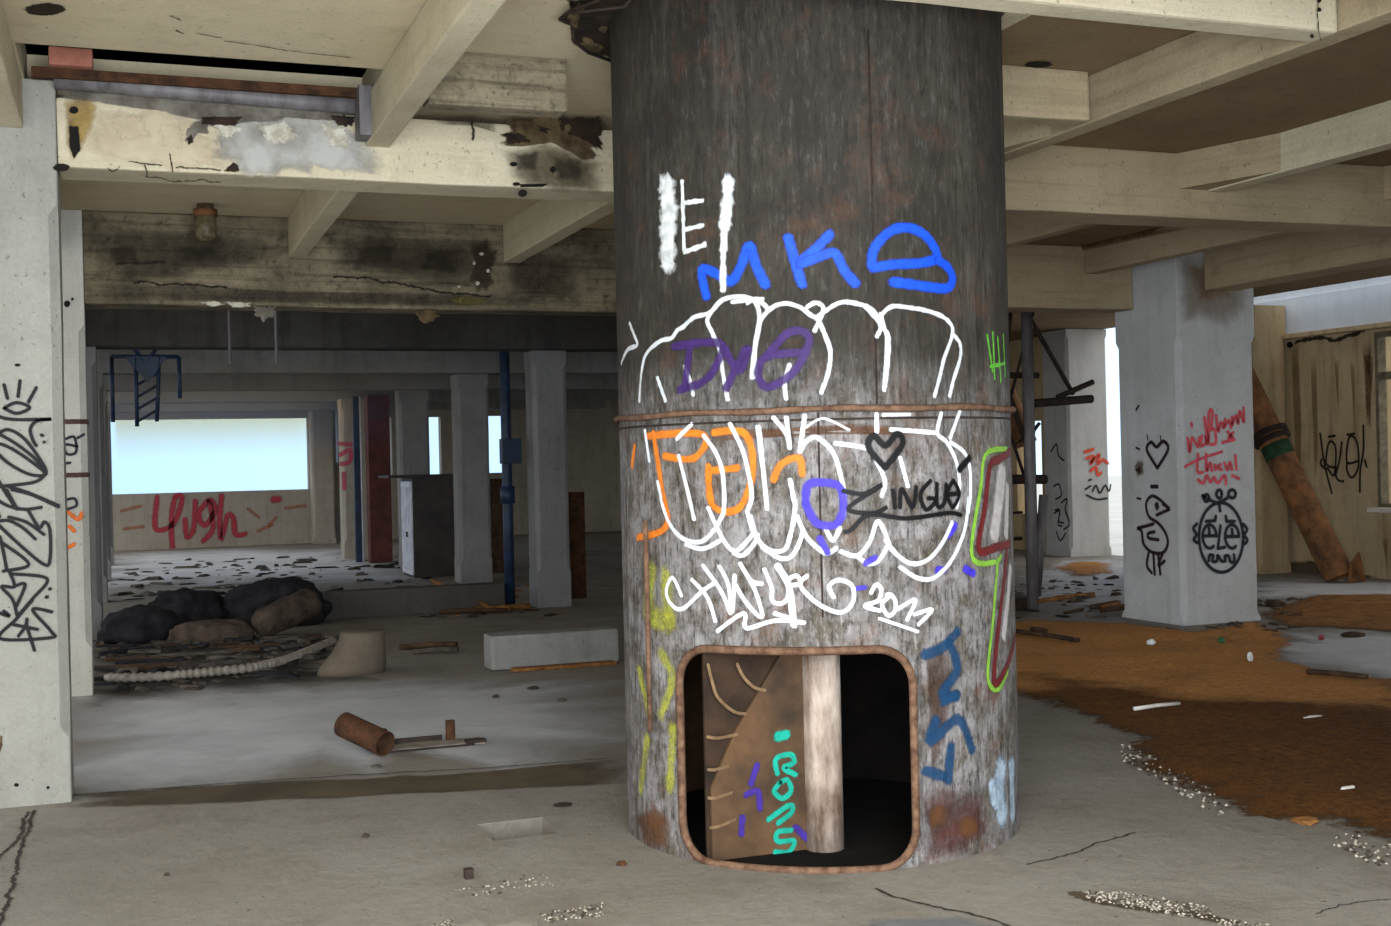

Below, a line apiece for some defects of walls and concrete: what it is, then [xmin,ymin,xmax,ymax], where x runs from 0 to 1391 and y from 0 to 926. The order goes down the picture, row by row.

spalling [558,0,632,62]
peeling [65,90,372,175]
spalling [501,115,603,160]
spalling [513,166,556,197]
leakage [514,149,593,188]
crack [115,261,227,288]
leakage [173,289,477,307]
crack [333,276,491,298]
crack [0,810,36,925]
crack [874,888,1010,926]
crack [1316,899,1388,914]